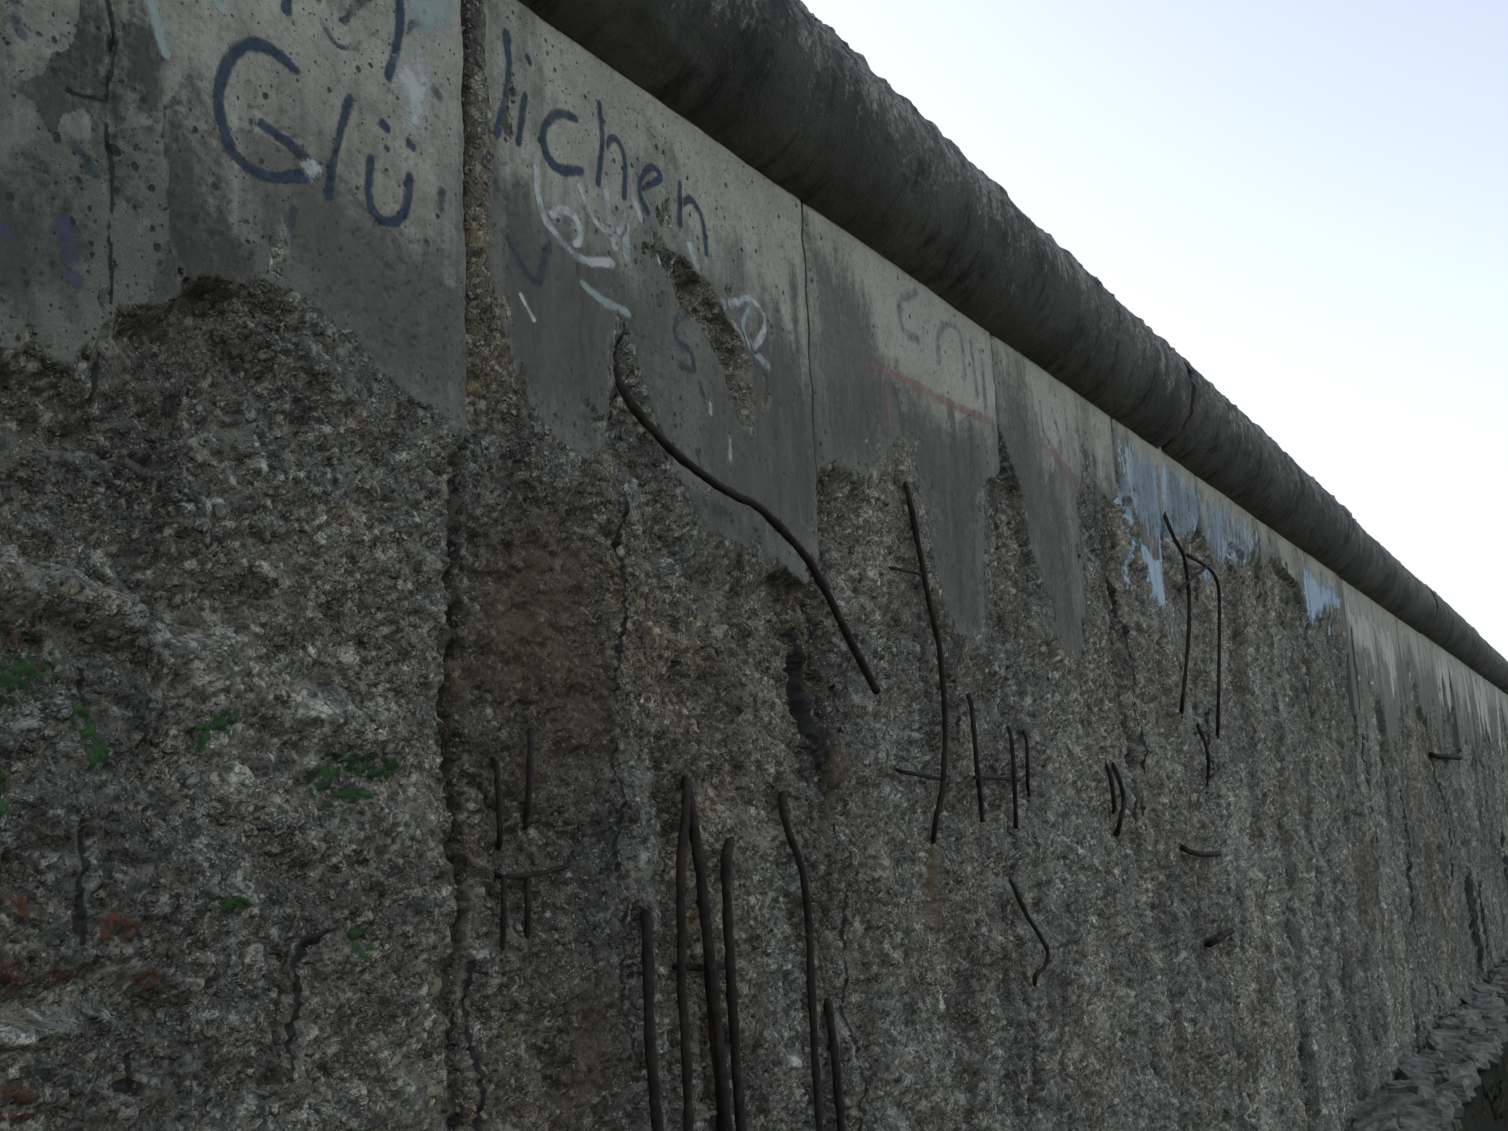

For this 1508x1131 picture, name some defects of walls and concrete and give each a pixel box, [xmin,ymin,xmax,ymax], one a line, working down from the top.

crack [65,0,121,304]
spalling [0,0,881,1131]
spalling [800,417,1508,1131]